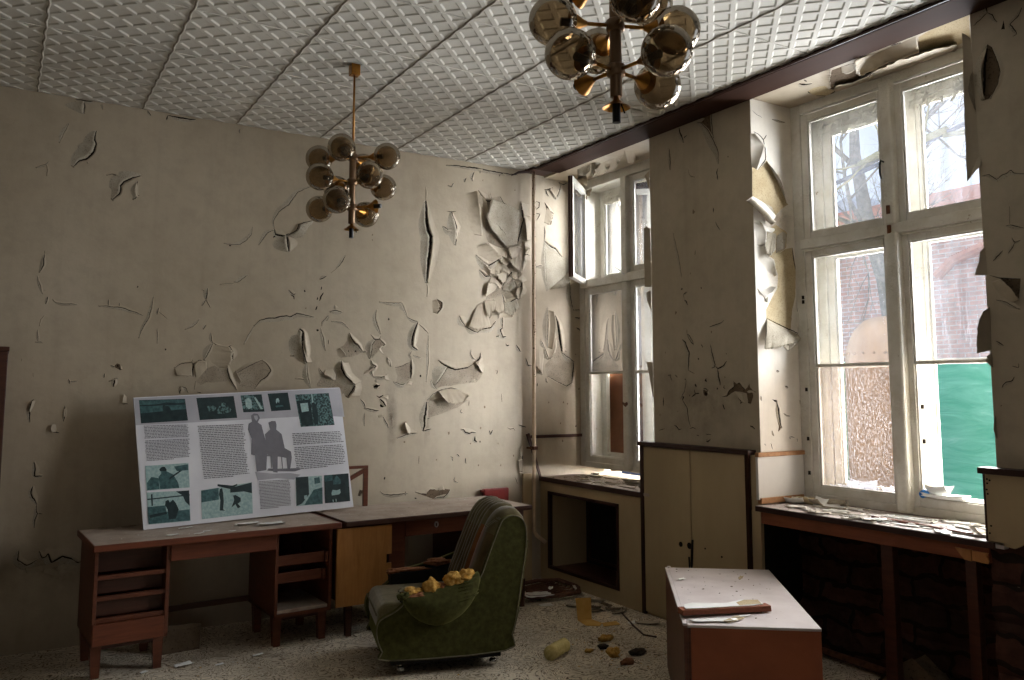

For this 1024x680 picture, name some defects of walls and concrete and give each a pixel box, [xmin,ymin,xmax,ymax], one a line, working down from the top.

peeling [808,15,1005,181]
crack [21,251,248,361]
peeling [174,332,274,394]
crack [244,255,350,351]
peeling [288,300,415,399]
peeling [397,422,417,443]
peeling [432,299,445,314]
crack [418,172,483,296]
peeling [427,349,484,418]
peeling [442,151,650,391]
crack [659,320,727,443]
peeling [746,132,801,351]